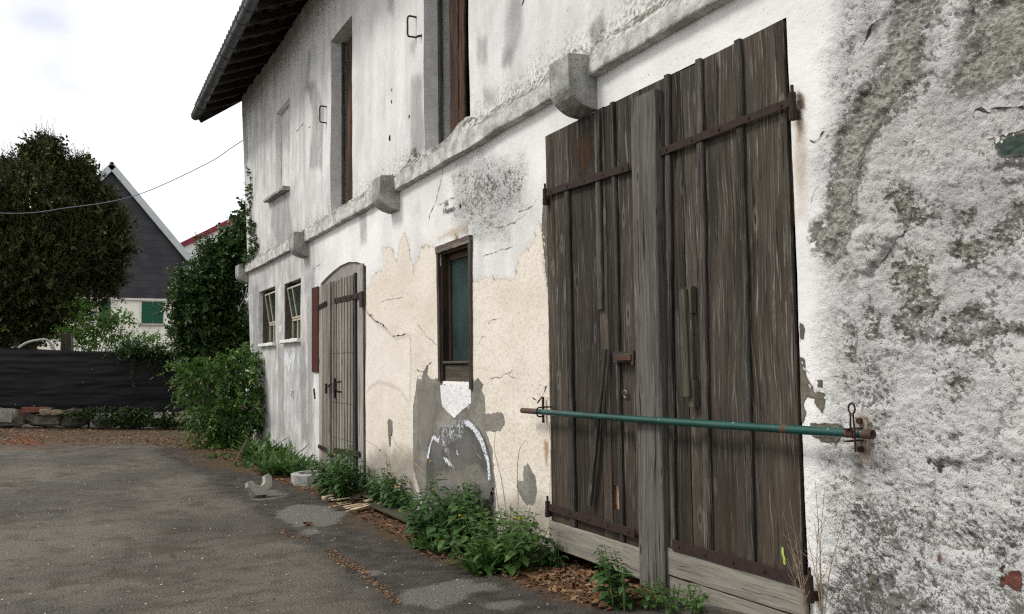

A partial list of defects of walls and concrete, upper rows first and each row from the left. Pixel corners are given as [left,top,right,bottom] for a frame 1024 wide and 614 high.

peeling [994,129,1024,157]
crack [367,297,433,373]
peeling [365,232,438,495]
peeling [473,221,551,560]
flaking render [799,342,912,443]
peeling [831,491,1024,614]